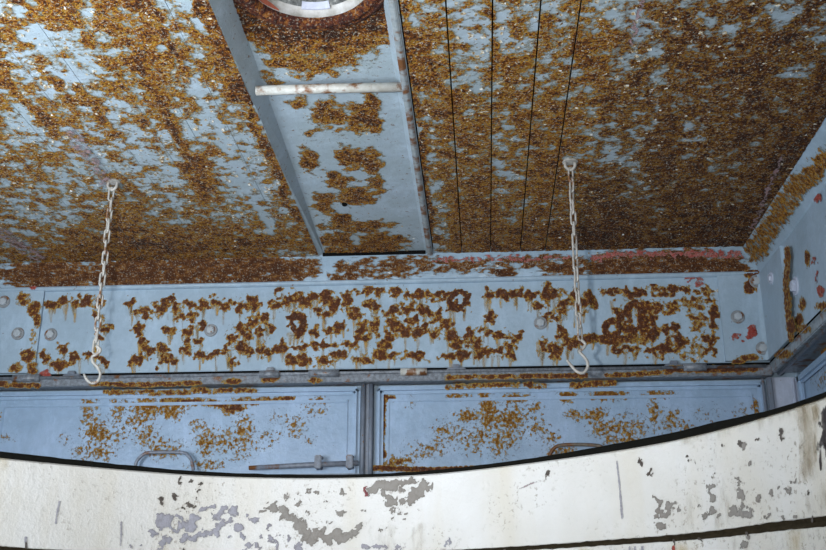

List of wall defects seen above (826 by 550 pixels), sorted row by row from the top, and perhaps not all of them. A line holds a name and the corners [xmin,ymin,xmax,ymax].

corrosion [0,0,826,374]
corrosion [0,381,41,389]
corrosion [123,281,763,472]
corrosion [72,377,295,469]
peeling [148,476,404,550]
peeling [363,476,433,532]
peeling [652,495,681,530]
peeling [697,473,796,520]